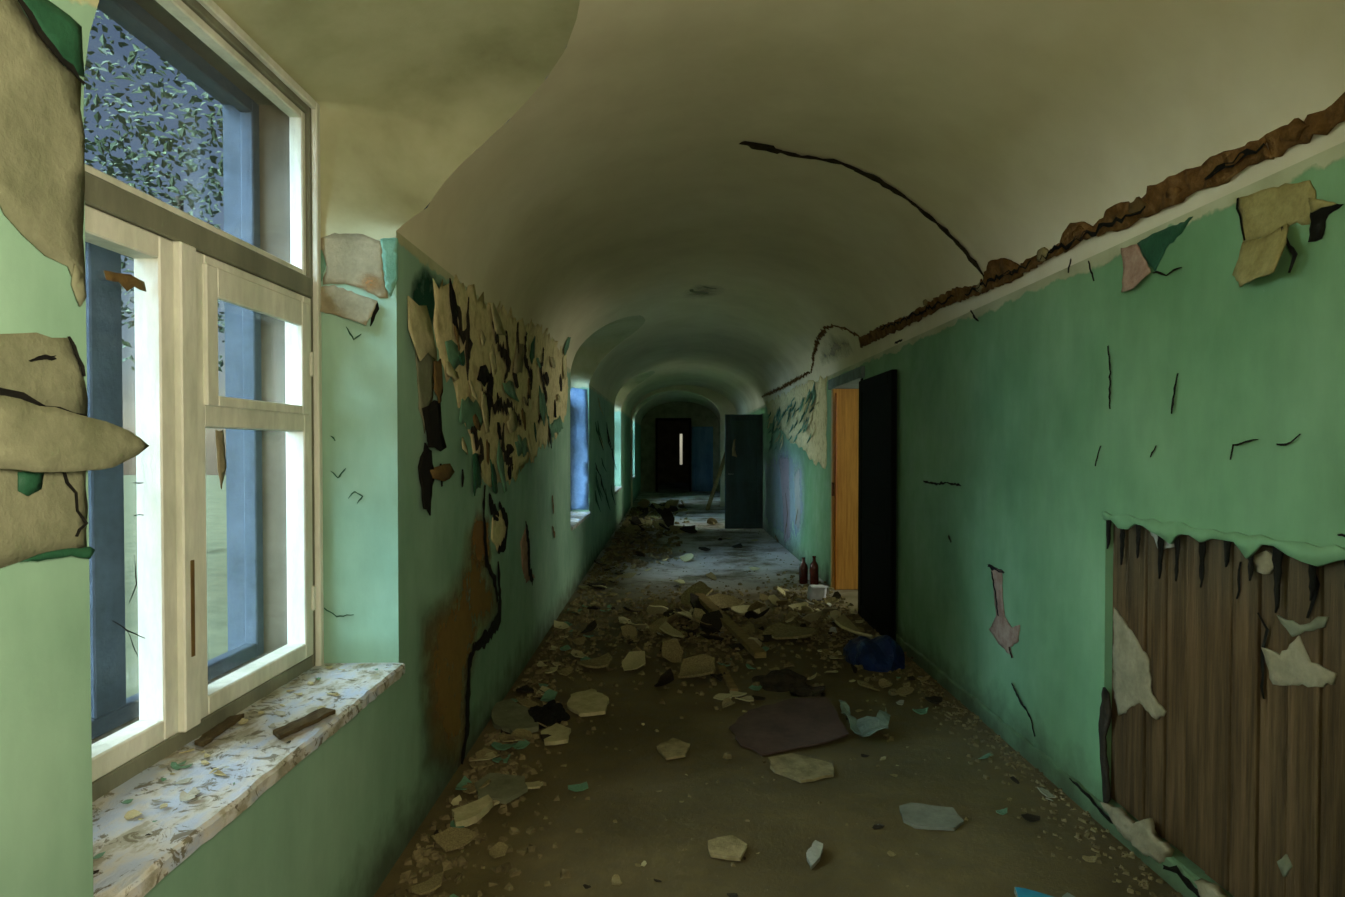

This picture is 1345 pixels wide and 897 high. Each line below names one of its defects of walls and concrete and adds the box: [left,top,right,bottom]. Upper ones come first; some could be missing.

flaking render [0,0,87,307]
crack [739,141,984,278]
crack [1068,259,1094,281]
flaking render [859,92,1345,348]
peeling [0,333,149,568]
peeling [320,233,617,585]
crack [1105,346,1113,409]
crack [1171,373,1179,414]
crack [1230,434,1301,460]
flaking render [629,499,718,533]
flaking render [1069,778,1228,897]